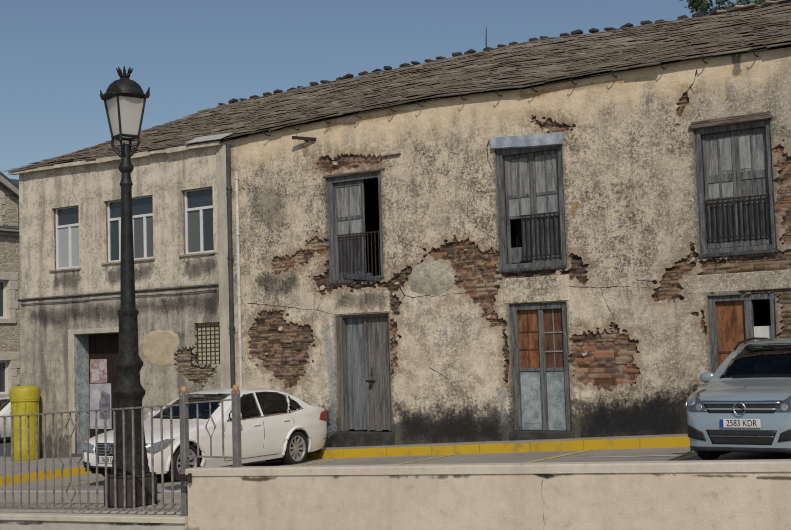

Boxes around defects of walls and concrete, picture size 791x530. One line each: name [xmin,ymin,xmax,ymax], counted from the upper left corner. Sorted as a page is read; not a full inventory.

flaking render [530,117,576,133]
flaking render [674,92,690,125]
flaking render [317,154,382,174]
flaking render [652,140,791,304]
peeling [141,330,217,387]
flaking render [247,309,315,390]
flaking render [272,231,590,384]
flaking render [570,322,644,392]
flaking render [691,310,707,336]
flaking render [739,289,791,338]
damp [403,412,498,443]
damp [581,385,695,438]